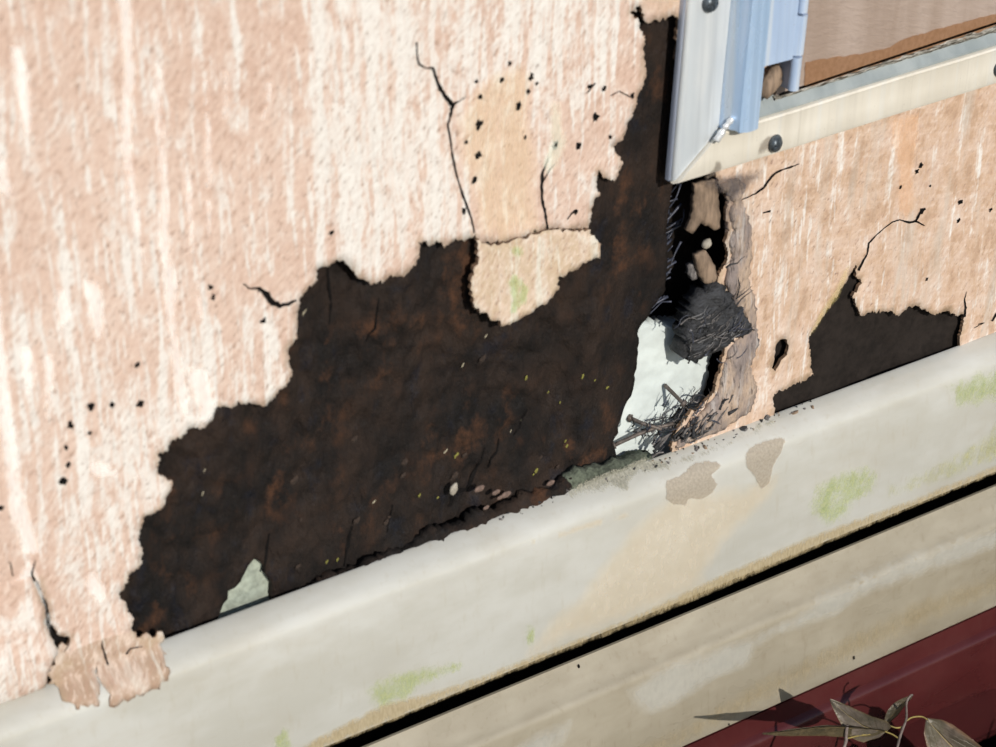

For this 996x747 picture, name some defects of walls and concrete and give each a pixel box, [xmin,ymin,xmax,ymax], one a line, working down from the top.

crack [416,42,475,233]
crack [540,158,576,230]
crack [742,164,799,213]
crack [858,208,926,271]
crack [243,283,297,308]
peeling [468,227,601,326]